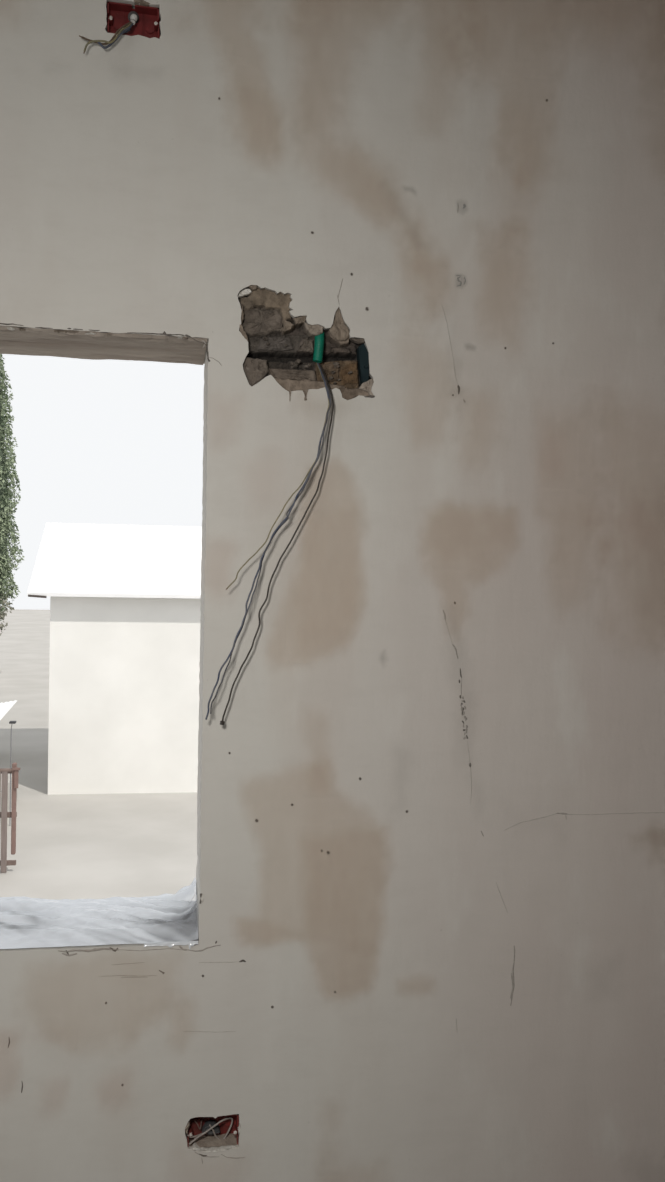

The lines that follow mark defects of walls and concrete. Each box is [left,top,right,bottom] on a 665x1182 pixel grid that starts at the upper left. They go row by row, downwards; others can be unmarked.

flaking render [238,285,375,401]
crack [441,304,466,403]